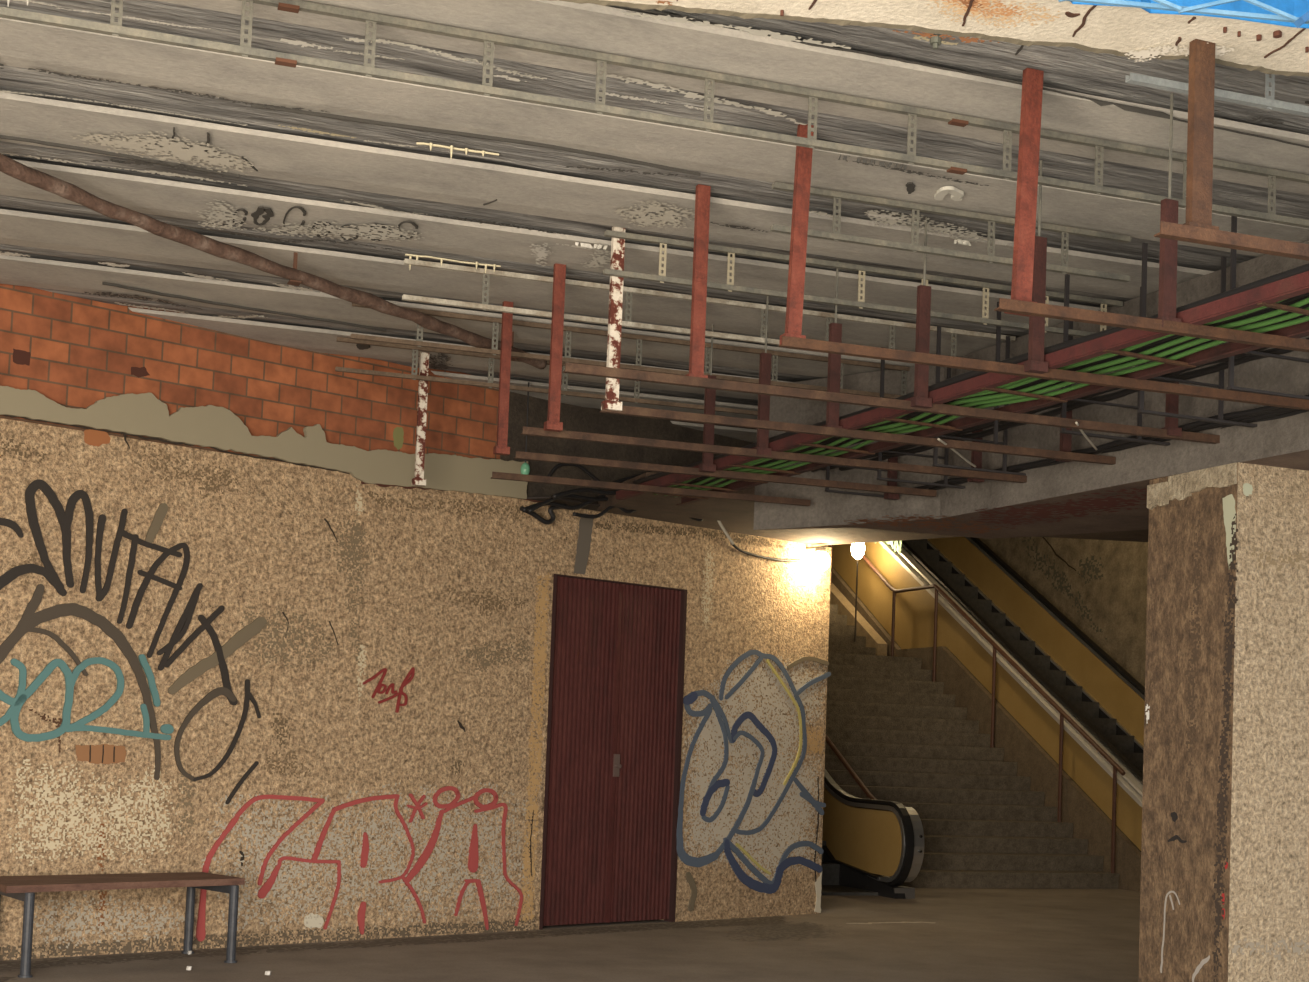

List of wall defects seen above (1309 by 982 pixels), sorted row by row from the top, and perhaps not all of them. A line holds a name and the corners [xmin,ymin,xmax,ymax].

crack [609,0,1309,148]
rust [893,0,1060,43]
rust [1223,27,1282,41]
flaking render [0,284,528,499]